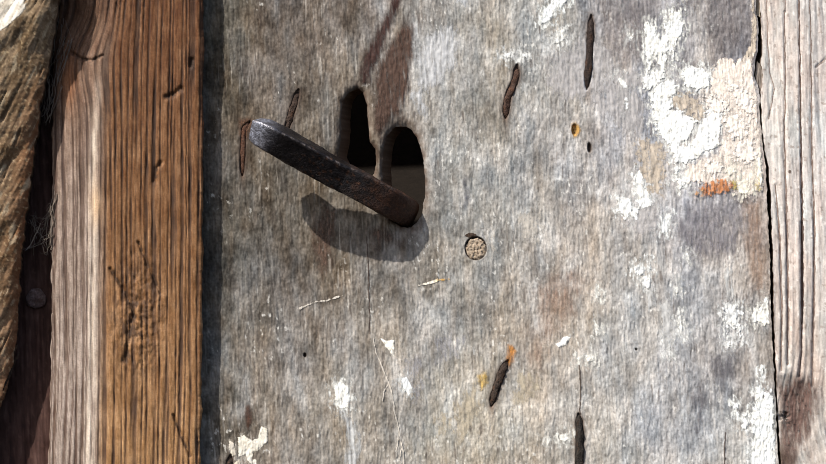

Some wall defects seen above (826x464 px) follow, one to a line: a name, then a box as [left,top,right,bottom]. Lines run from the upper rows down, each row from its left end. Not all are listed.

peeling [532,0,574,51]
corrosion [360,0,413,135]
peeling [493,44,532,68]
peeling [608,0,763,203]
corrosion [695,179,737,196]
crack [766,0,826,386]
peeling [229,426,268,464]